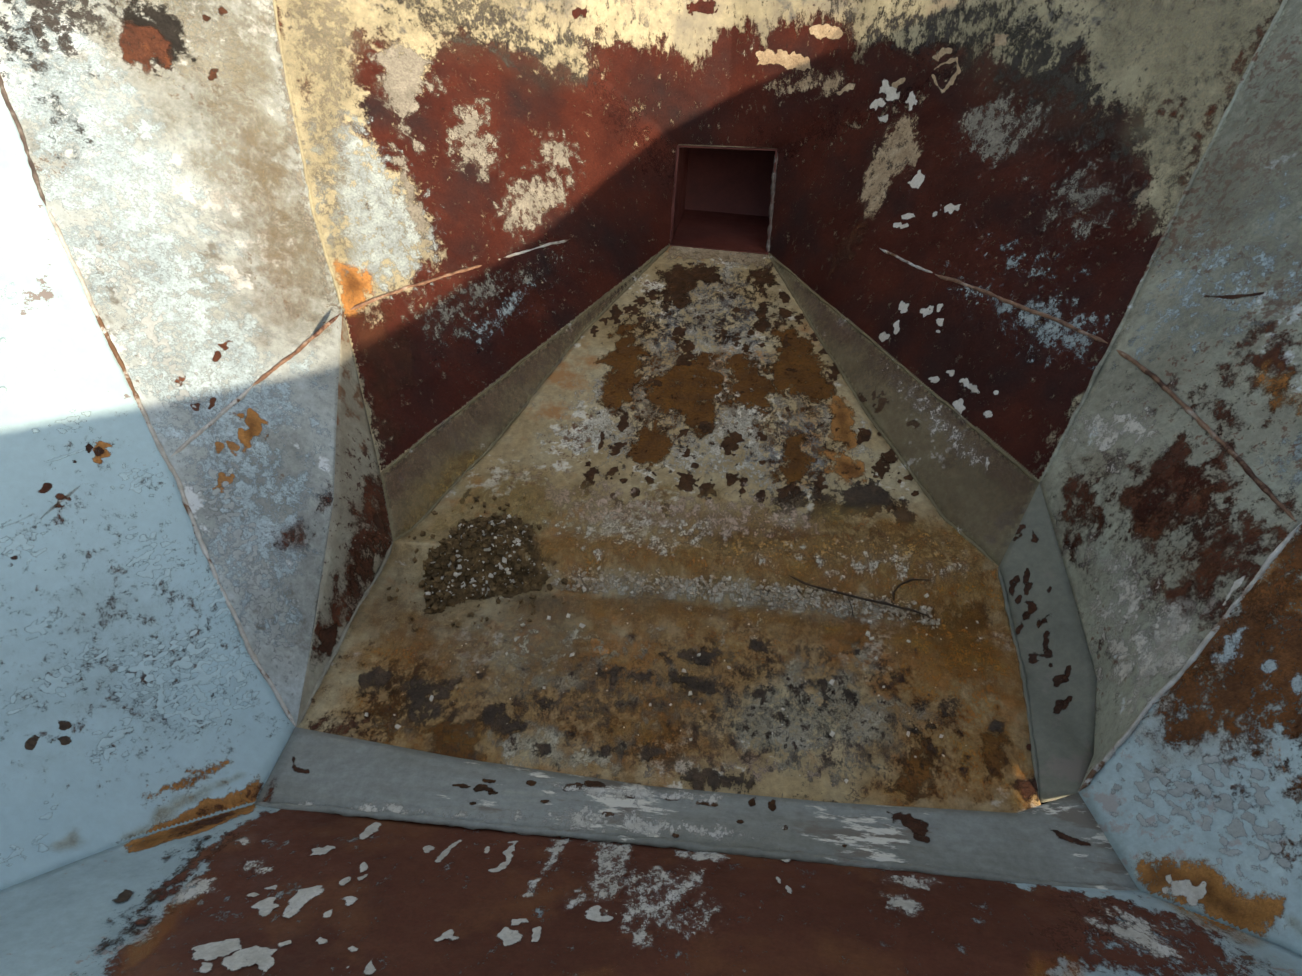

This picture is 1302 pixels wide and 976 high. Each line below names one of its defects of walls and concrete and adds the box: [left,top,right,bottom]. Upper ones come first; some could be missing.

corrosion [115,0,218,81]
corrosion [687,0,719,15]
peeling [265,0,1283,479]
corrosion [603,320,867,491]
corrosion [1054,321,1302,816]
corrosion [307,474,1039,811]
corrosion [124,719,276,853]
peeling [453,779,498,805]
peeling [563,780,606,792]
peeling [748,797,776,811]
peeling [79,809,1281,976]
corrosion [1136,852,1286,942]